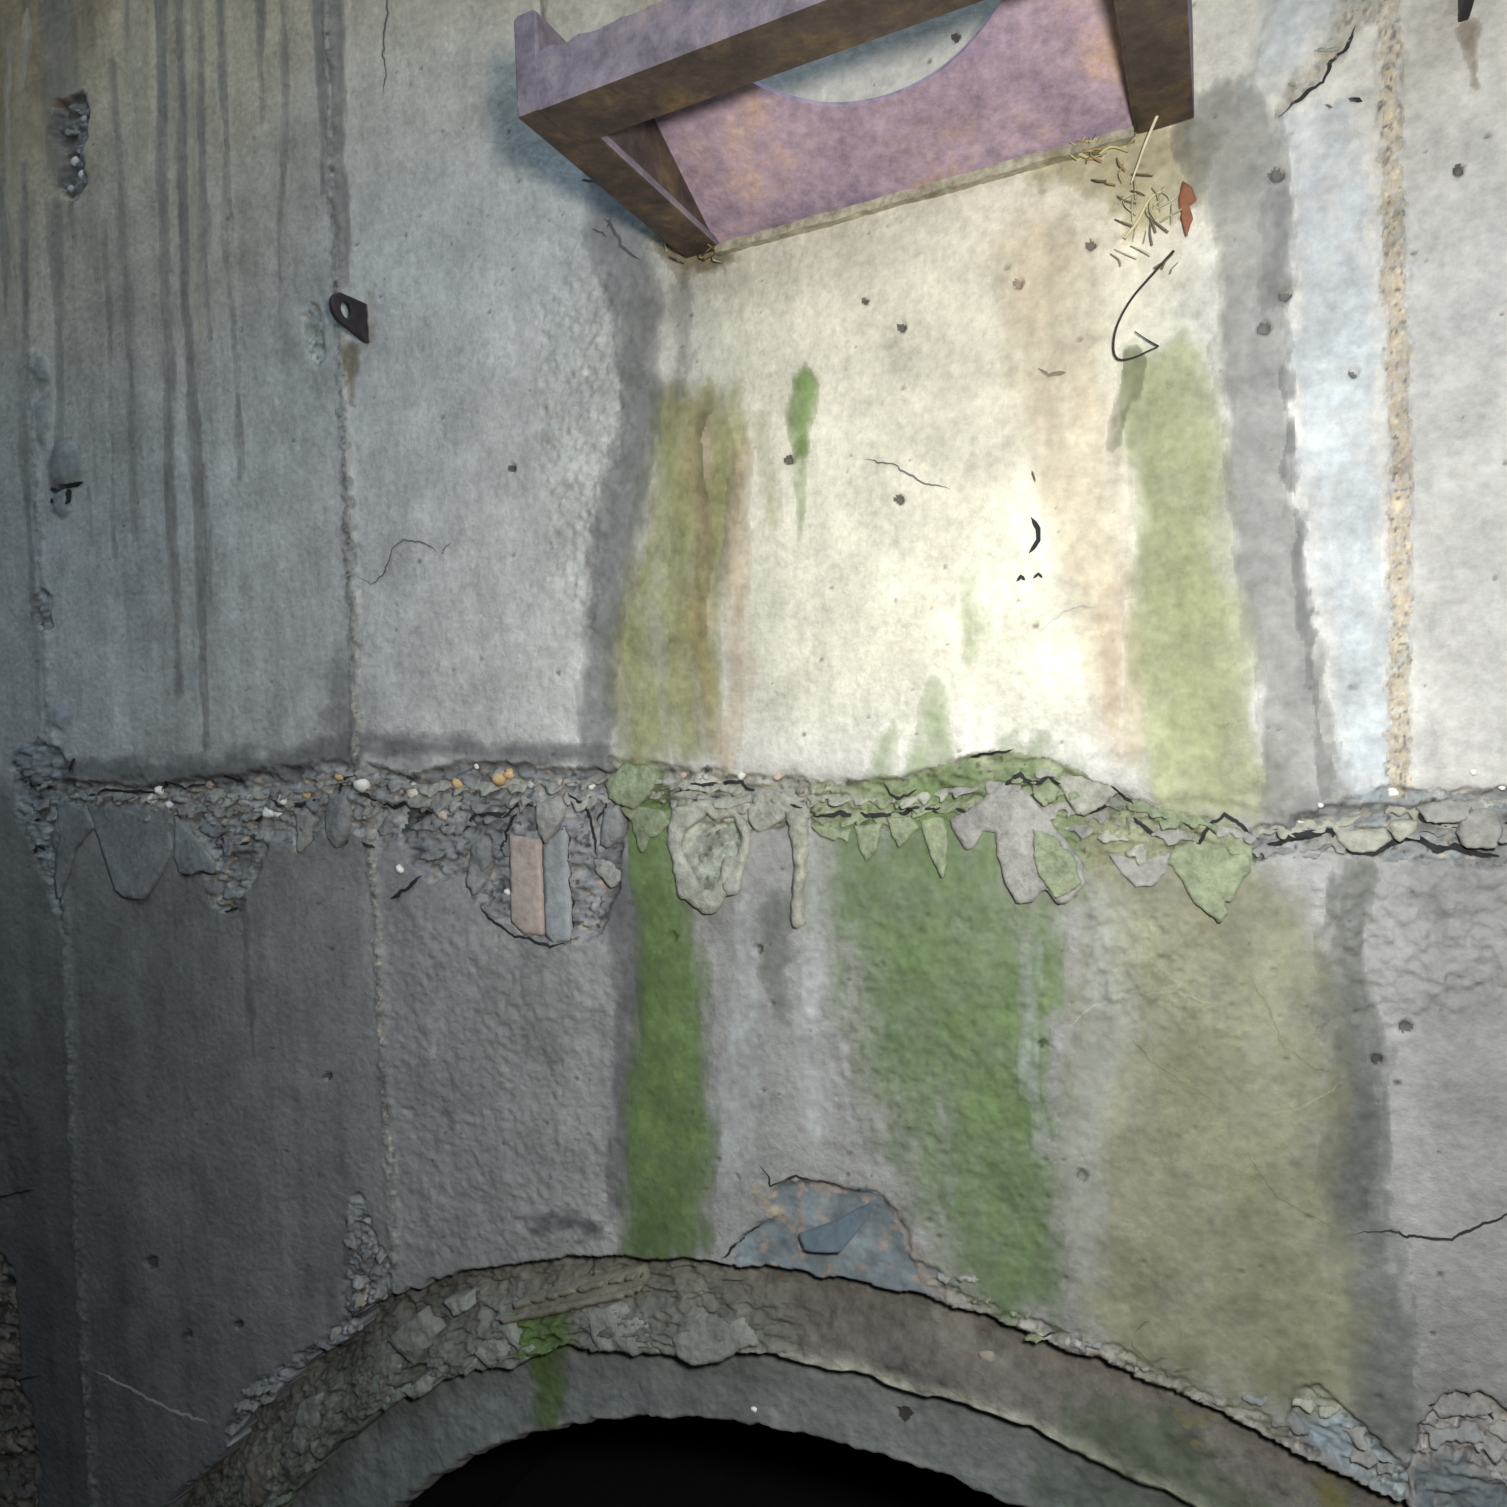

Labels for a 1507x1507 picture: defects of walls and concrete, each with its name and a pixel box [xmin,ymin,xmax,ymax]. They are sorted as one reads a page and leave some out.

spalling [48,90,90,202]
damp [135,0,195,336]
damp [313,0,348,279]
crack [381,0,389,91]
crack [1279,25,1356,117]
damp [190,361,204,629]
crack [863,459,951,490]
spalling [12,736,1507,946]
damp [928,849,950,885]
crack [1255,1164,1507,1241]
spalling [224,1192,395,1448]
spalling [735,1180,1507,1507]